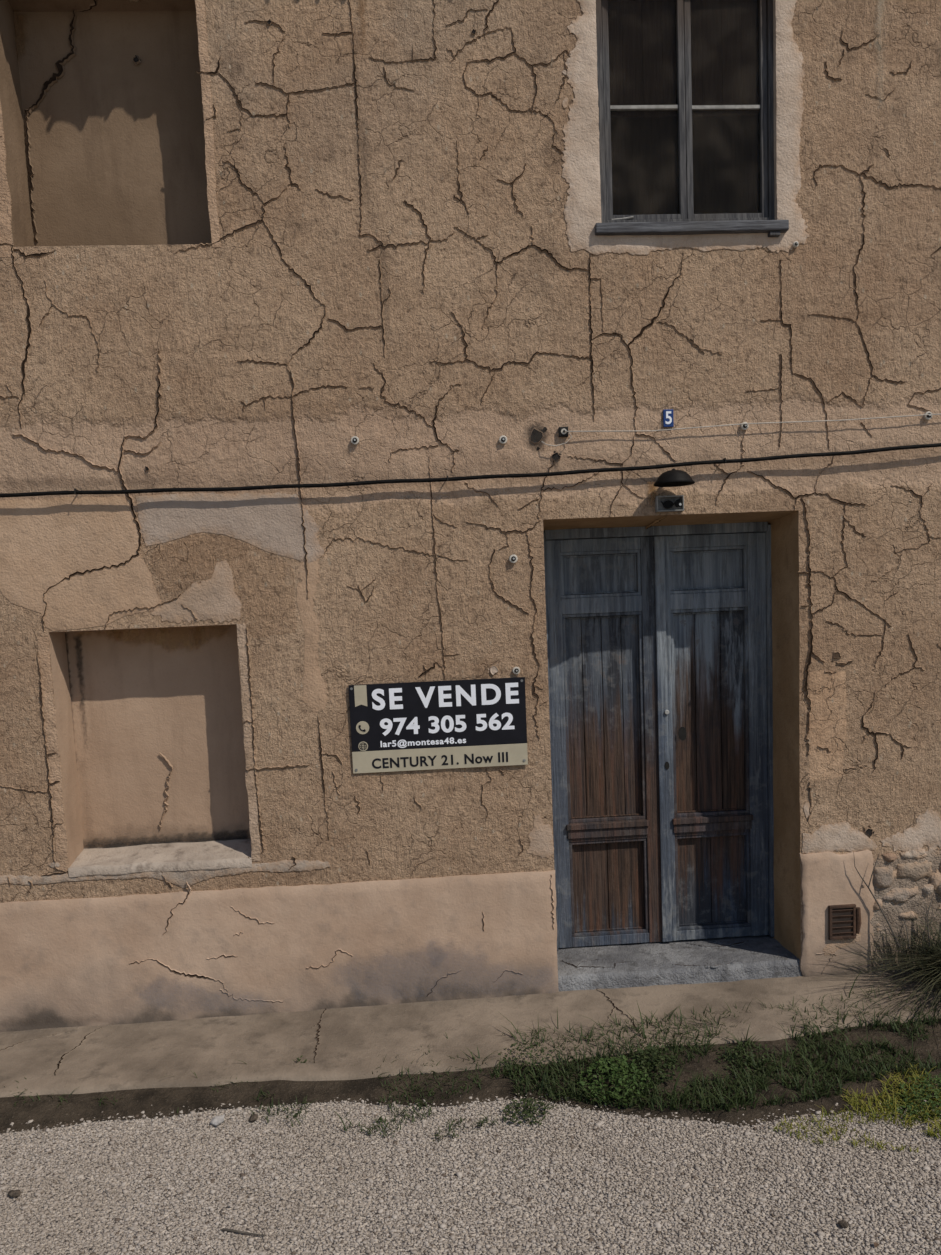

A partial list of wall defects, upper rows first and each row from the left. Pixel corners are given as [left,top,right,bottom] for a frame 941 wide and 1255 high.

crack [824,30,913,101]
crack [175,0,722,740]
crack [0,0,162,887]
crack [714,148,941,821]
crack [105,594,198,628]
spalling [150,533,297,639]
crack [243,628,384,870]
crack [480,768,505,822]
crack [548,875,556,929]
spalling [802,802,941,972]
crack [306,949,353,969]